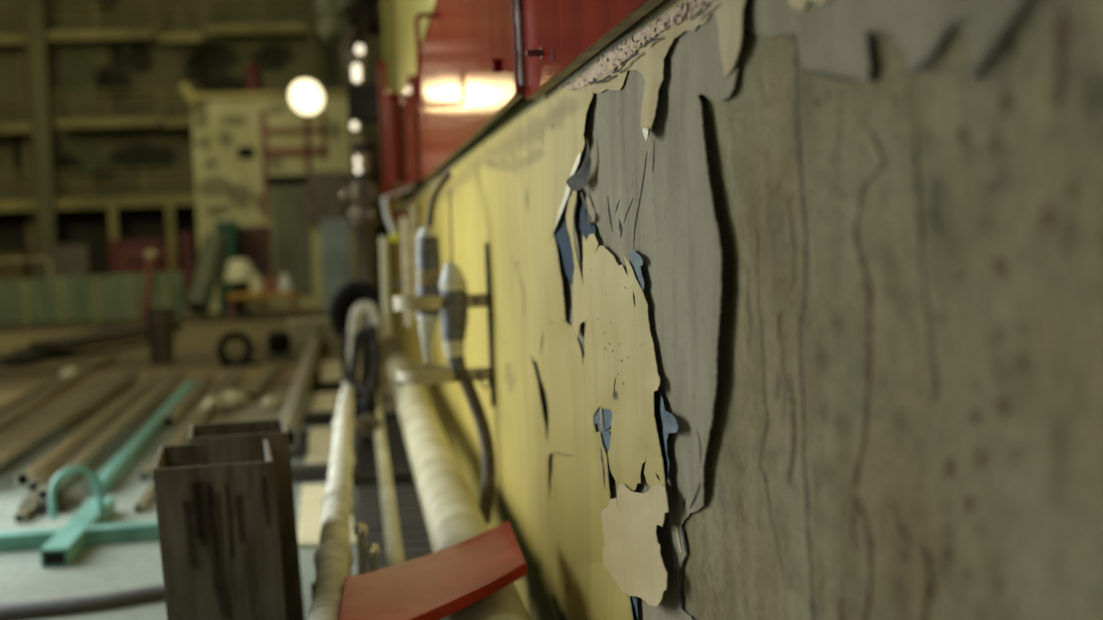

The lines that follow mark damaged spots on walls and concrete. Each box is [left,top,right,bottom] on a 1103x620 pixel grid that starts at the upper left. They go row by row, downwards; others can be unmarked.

peeling [391,0,1026,620]